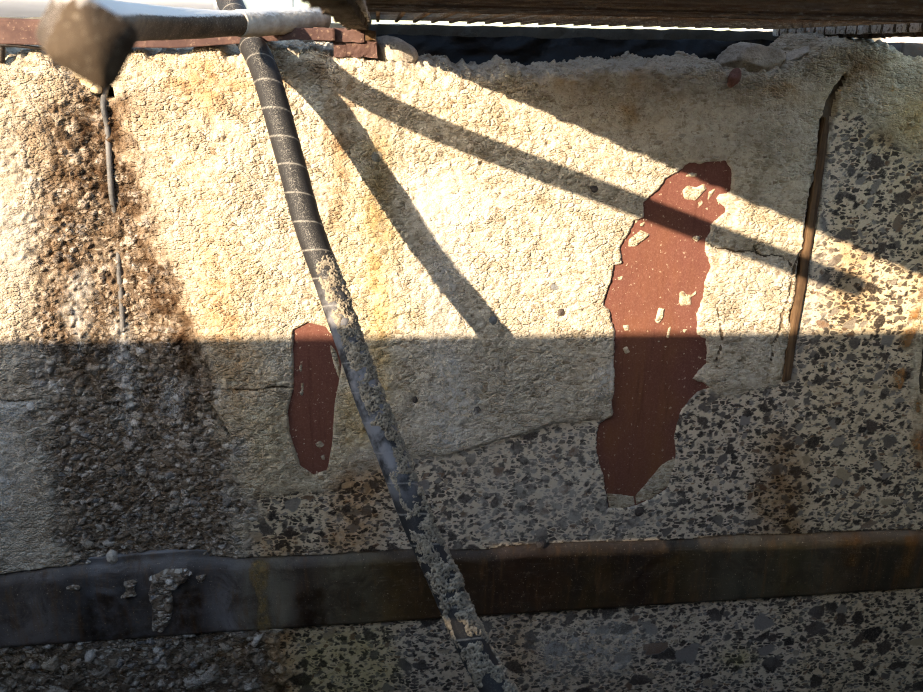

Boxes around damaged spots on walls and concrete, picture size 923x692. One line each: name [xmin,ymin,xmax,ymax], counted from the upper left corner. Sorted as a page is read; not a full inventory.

crack [817,76,845,137]
peeling [288,323,342,474]
peeling [414,160,732,550]
crack [708,198,808,367]
rust [901,309,918,348]
spalling [388,495,412,550]